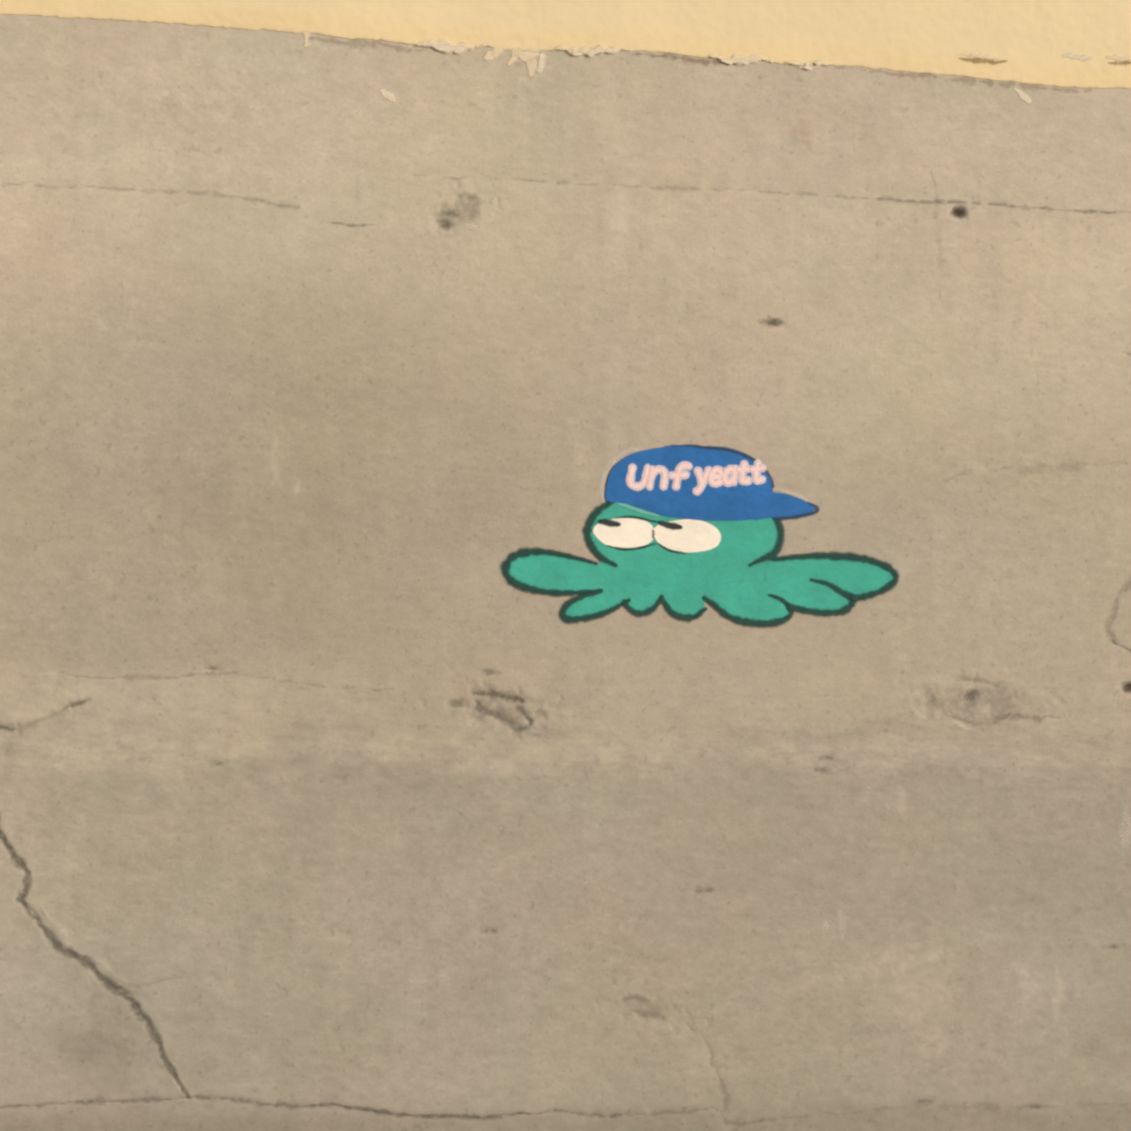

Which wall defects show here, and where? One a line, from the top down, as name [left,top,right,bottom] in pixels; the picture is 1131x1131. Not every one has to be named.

peeling [417,39,493,54]
peeling [959,53,1006,64]
crack [0,831,188,1096]